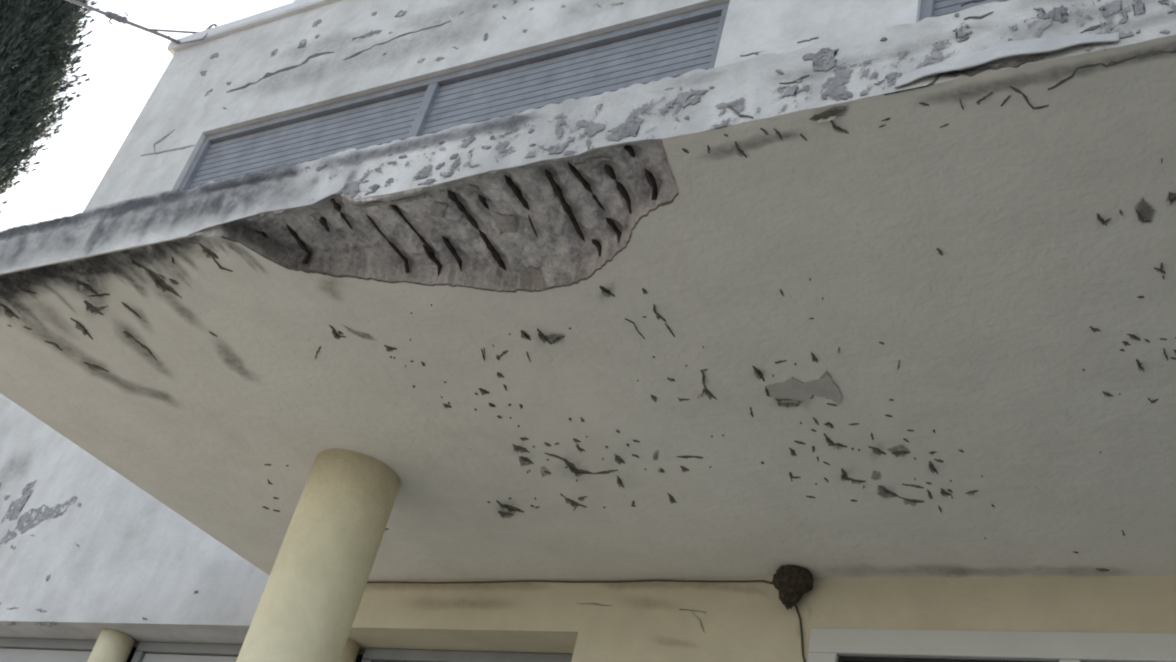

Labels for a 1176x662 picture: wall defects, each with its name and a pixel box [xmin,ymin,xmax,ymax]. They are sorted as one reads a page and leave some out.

crack [226,21,451,93]
peeling [773,13,973,134]
crack [961,0,993,20]
crack [884,50,1176,109]
peeling [998,0,1145,52]
crack [1080,23,1105,33]
spalling [187,86,714,297]
peeling [509,328,571,361]
peeling [753,352,841,408]
peeling [475,346,665,488]
peeling [789,417,983,513]
peeling [0,480,82,550]